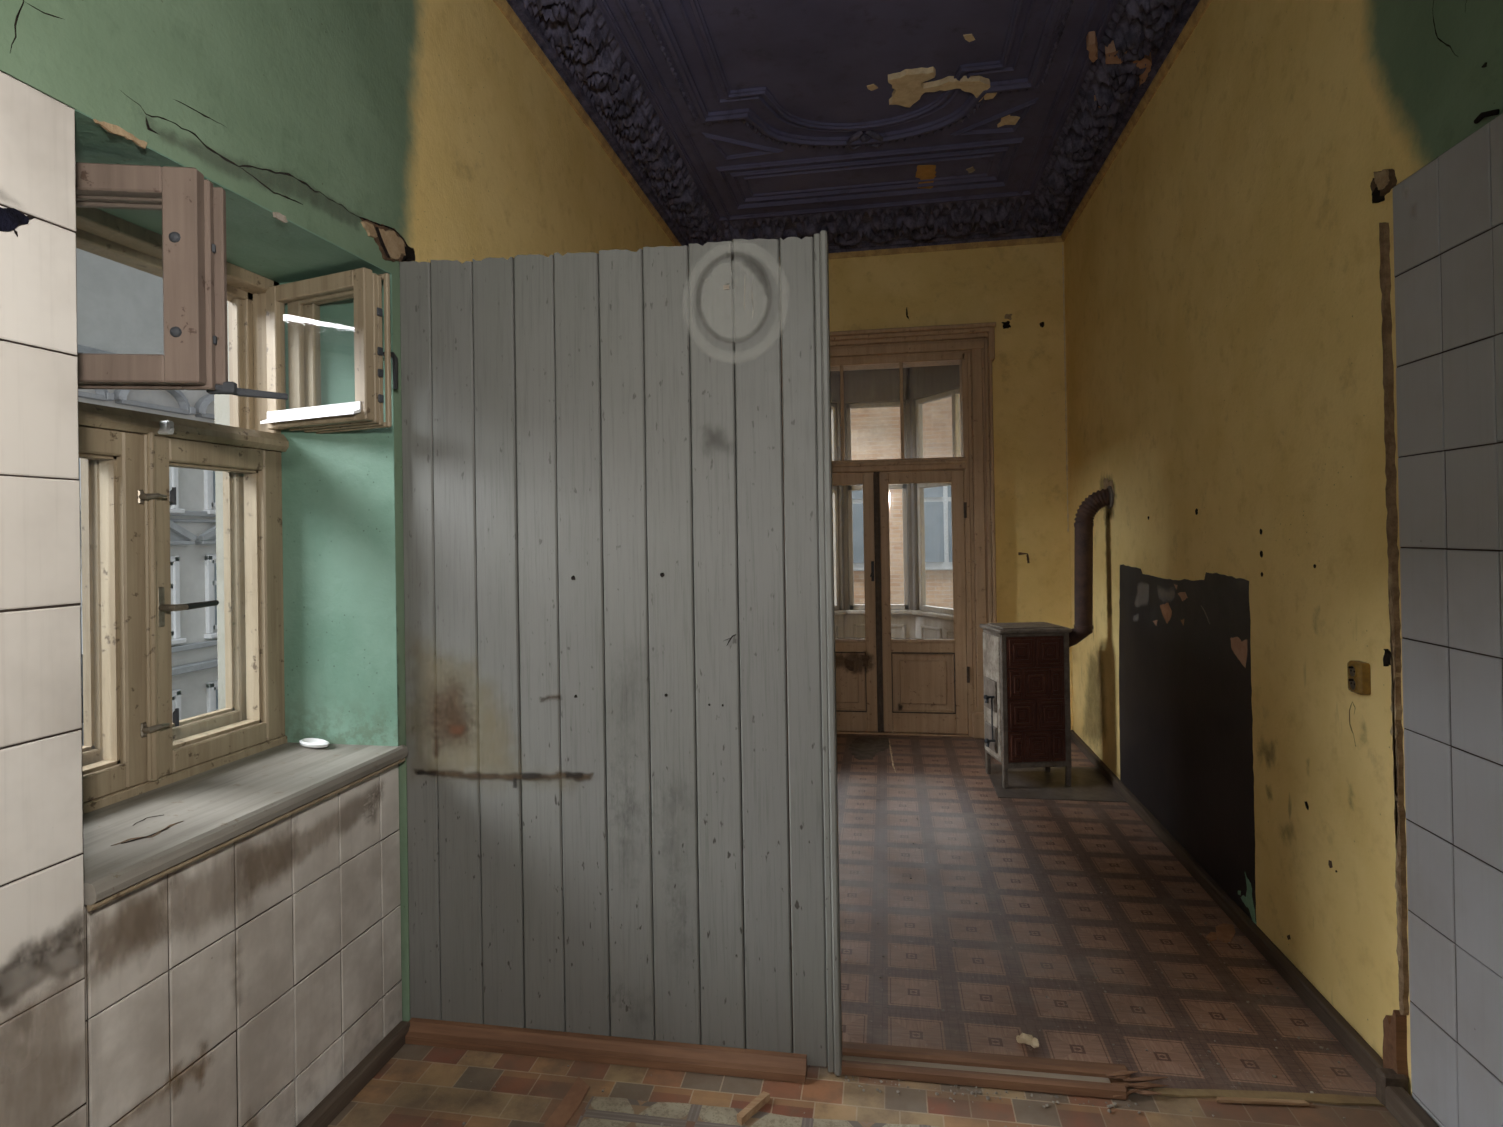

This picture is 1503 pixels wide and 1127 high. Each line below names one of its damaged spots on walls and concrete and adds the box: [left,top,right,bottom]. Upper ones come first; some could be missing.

crack [10,0,65,53]
peeling [1086,31,1152,87]
peeling [867,66,997,108]
peeling [997,115,1020,127]
crack [120,90,359,217]
peeling [915,165,936,189]
spalling [1370,169,1397,203]
spalling [0,207,37,237]
spalling [359,217,415,262]
peeling [1153,584,1208,626]
flaking render [1379,222,1409,1015]
peeling [1230,637,1248,668]